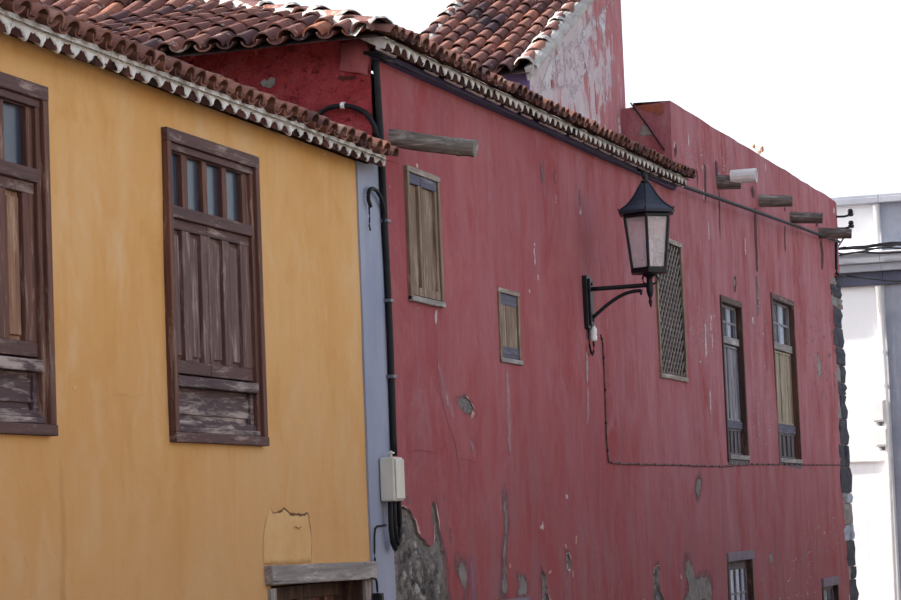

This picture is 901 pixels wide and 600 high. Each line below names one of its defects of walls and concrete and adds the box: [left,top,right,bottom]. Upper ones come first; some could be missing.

peeling [539,3,613,97]
flaking render [394,503,450,600]
flaking render [681,556,712,600]